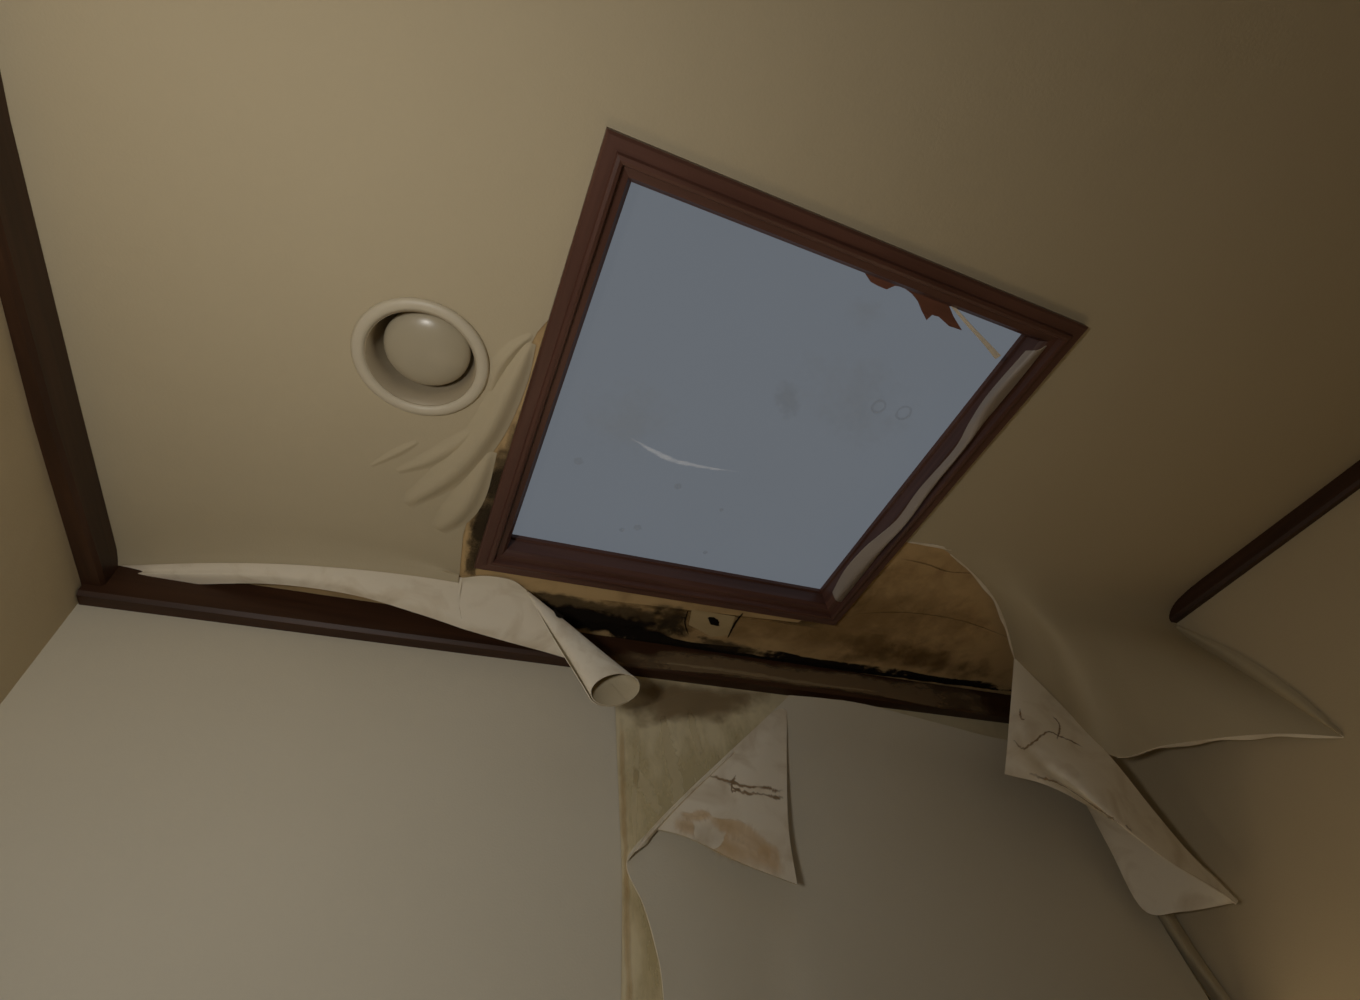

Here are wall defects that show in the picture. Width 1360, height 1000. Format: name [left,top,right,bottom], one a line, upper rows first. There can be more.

damp [647,687,744,718]
damp [714,776,780,799]